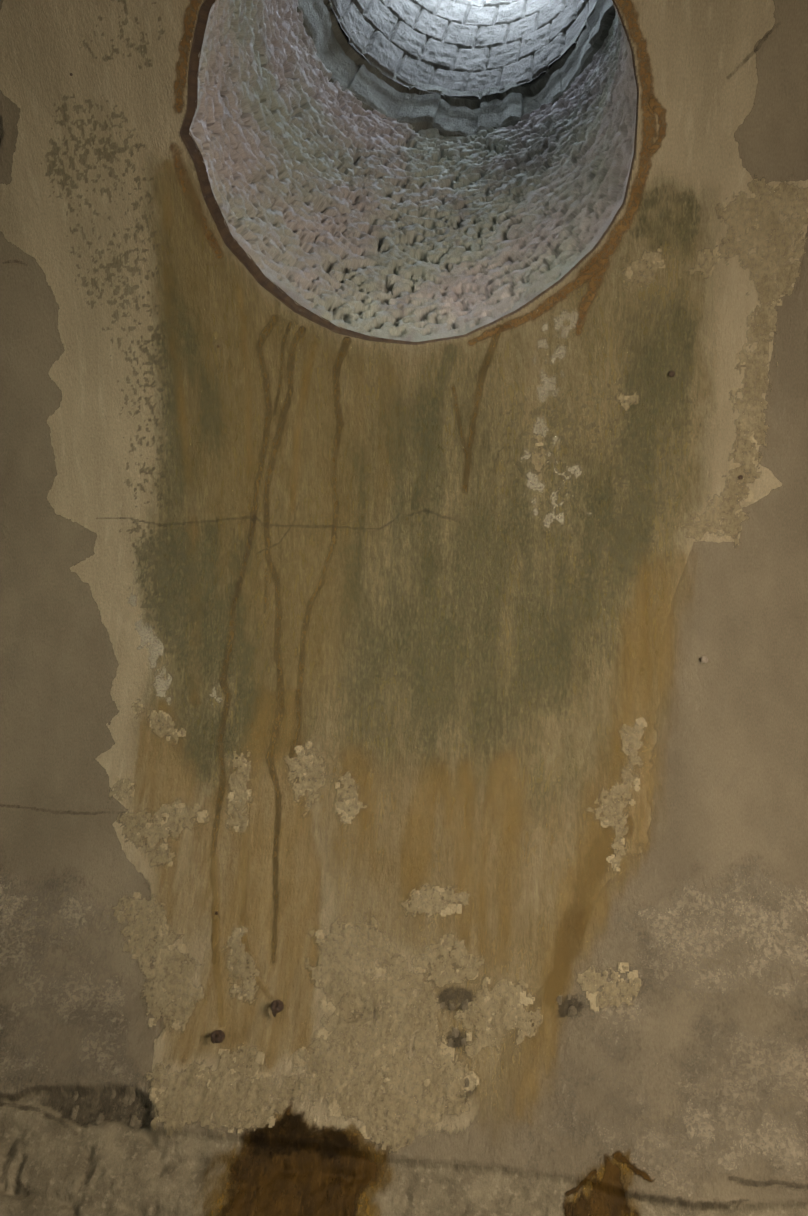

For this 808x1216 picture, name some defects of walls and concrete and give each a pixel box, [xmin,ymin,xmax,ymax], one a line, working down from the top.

rust [173,0,202,113]
rust [468,0,667,346]
water stain [85,161,711,1113]
peeling [557,962,642,1018]
spalling [42,1085,155,1129]
peeling [288,1089,365,1133]
peeling [415,1065,487,1142]